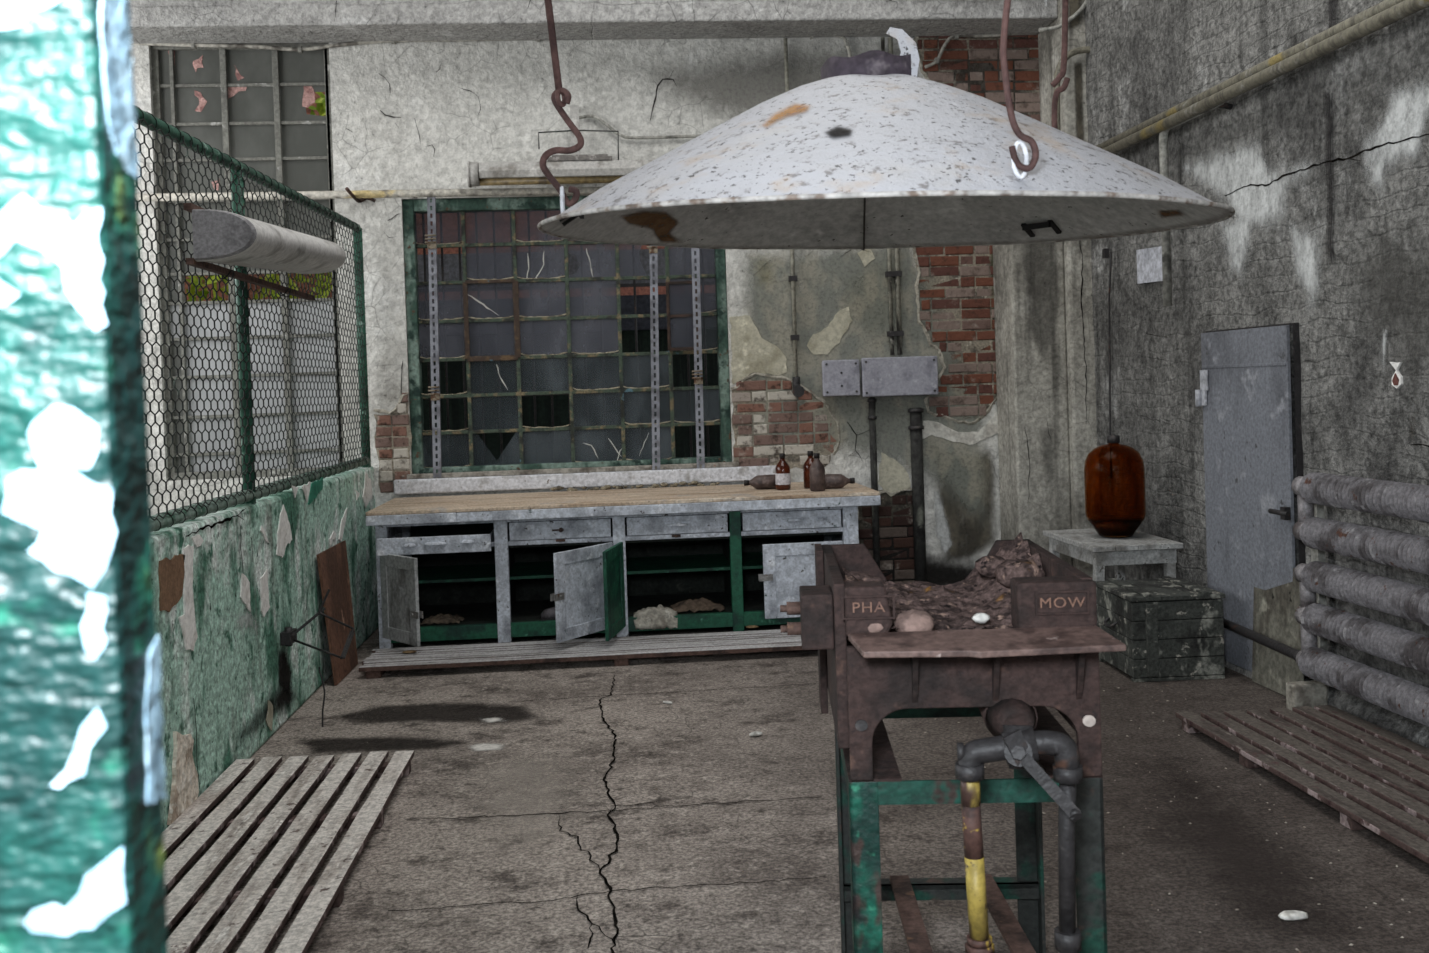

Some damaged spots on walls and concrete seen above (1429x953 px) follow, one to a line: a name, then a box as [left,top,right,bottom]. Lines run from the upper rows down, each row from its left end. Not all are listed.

peeling [99,0,139,180]
flaking render [914,34,1040,121]
crack [1225,134,1429,196]
peeling [0,194,107,331]
peeling [2,405,117,660]
peeling [158,534,204,651]
peeling [240,477,323,617]
flaking render [329,392,412,545]
flaking render [729,315,841,469]
flaking render [913,245,998,445]
peeling [144,635,167,804]
crack [388,675,826,953]